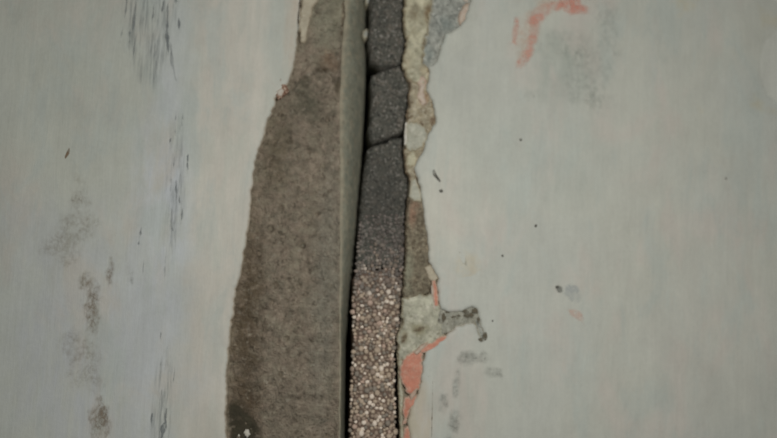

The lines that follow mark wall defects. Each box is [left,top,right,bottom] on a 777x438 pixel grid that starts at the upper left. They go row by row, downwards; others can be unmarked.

flaking render [226,0,345,438]
flaking render [396,0,470,438]